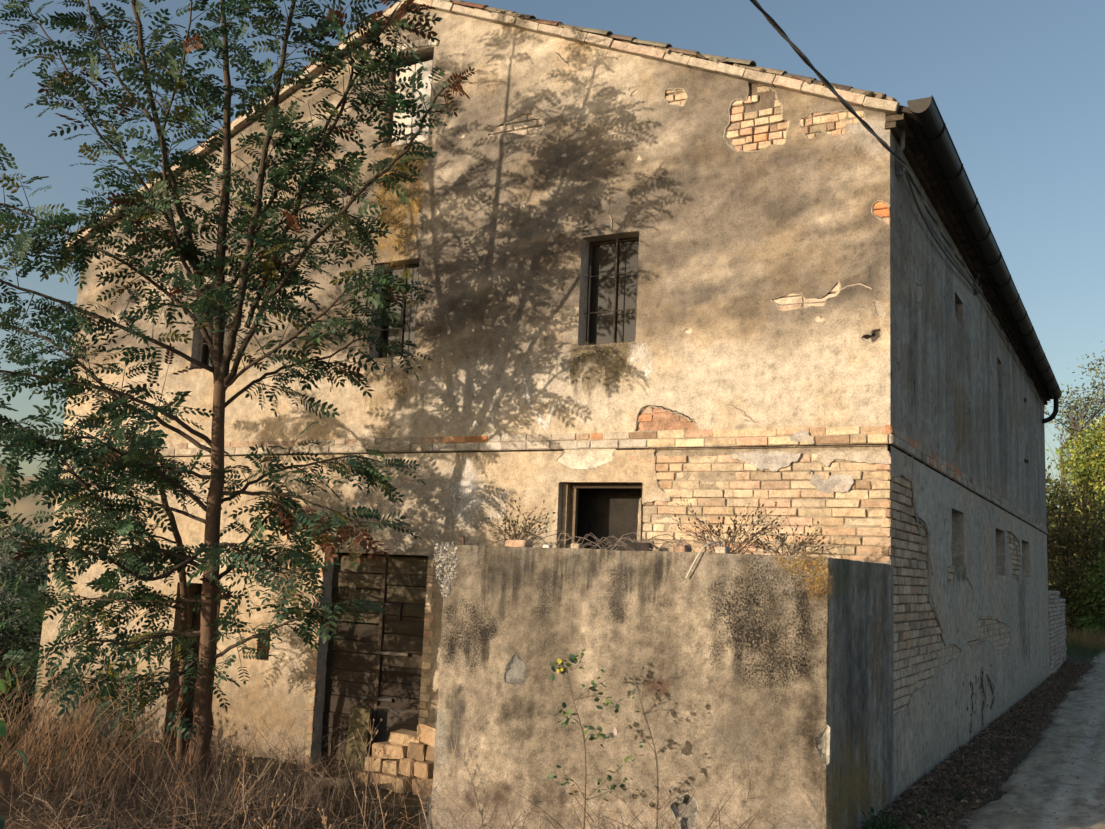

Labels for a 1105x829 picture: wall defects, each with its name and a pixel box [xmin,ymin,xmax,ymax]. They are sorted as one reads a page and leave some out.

flaking render [664,88,688,106]
flaking render [487,113,545,137]
flaking render [723,82,866,152]
flaking render [871,200,891,226]
flaking render [770,281,842,324]
flaking render [556,448,616,470]
flaking render [630,405,947,716]
damp [443,599,497,673]
damp [708,556,828,687]
spalling [504,654,527,685]
spalling [669,793,699,829]